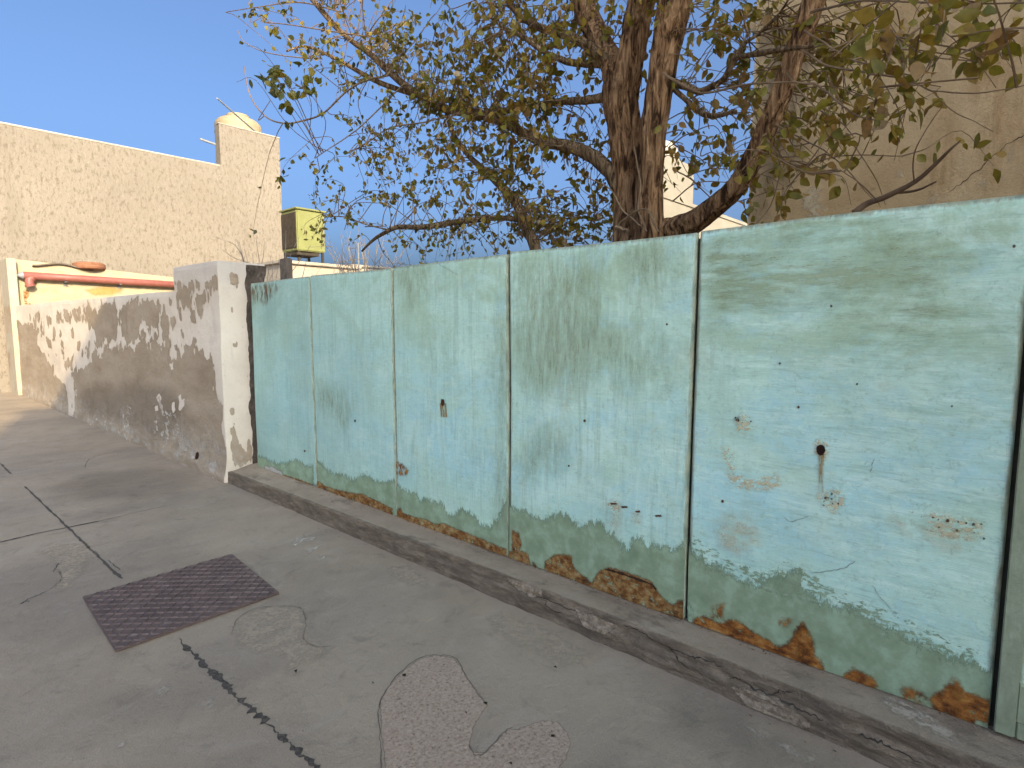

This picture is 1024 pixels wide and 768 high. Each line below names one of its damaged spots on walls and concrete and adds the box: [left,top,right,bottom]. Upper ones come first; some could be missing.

peeling [4,265,993,729]
corrosion [264,465,824,670]
crack [624,625,823,721]
corrosion [844,670,878,689]
crack [859,733,922,764]
corrosion [902,682,990,724]